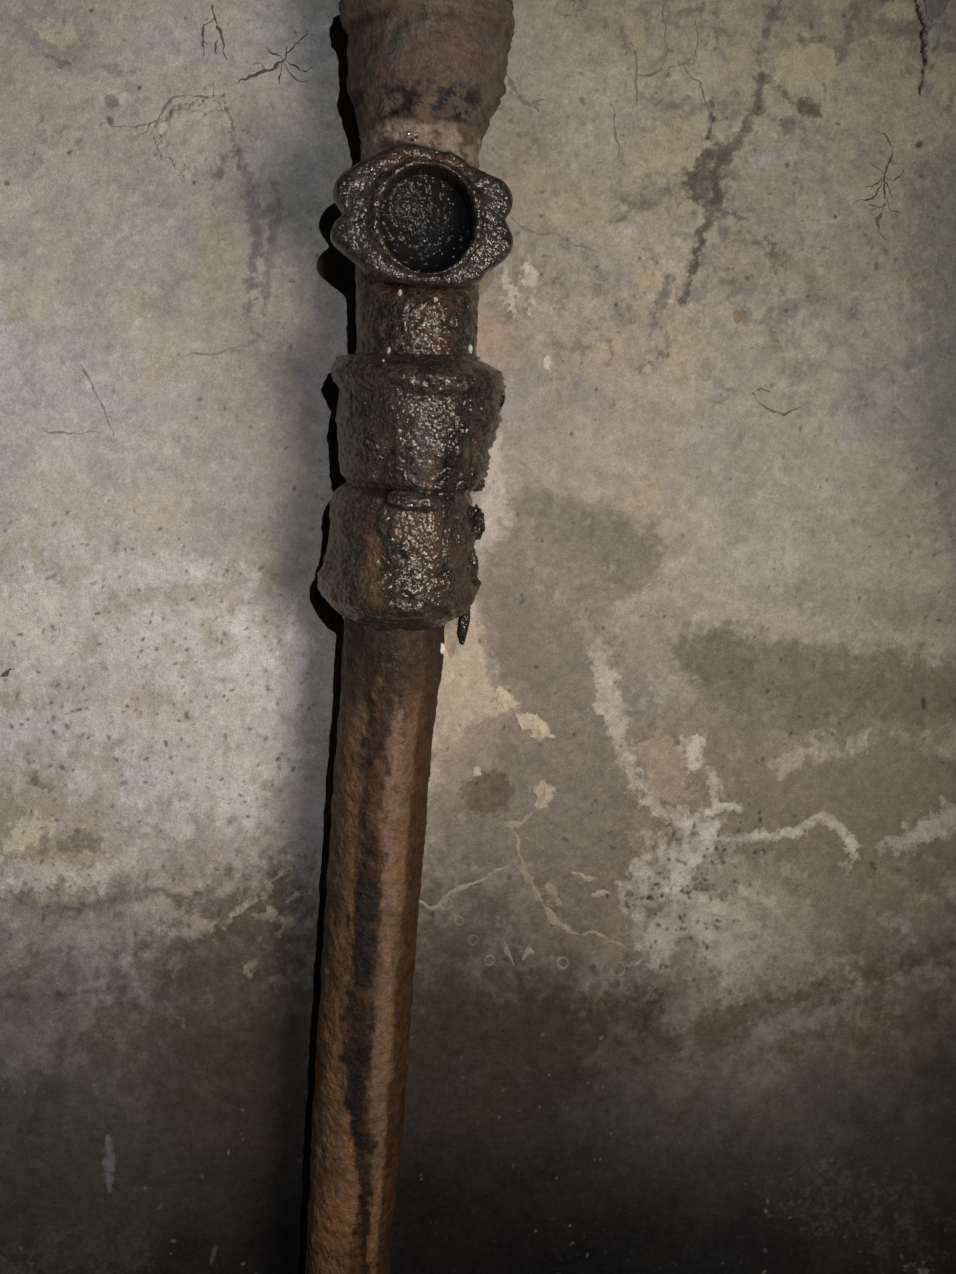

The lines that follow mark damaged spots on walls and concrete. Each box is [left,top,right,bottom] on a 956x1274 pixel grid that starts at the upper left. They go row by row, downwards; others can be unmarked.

crack [612,6,712,158]
crack [914,0,934,96]
leakage [390,95,956,1274]